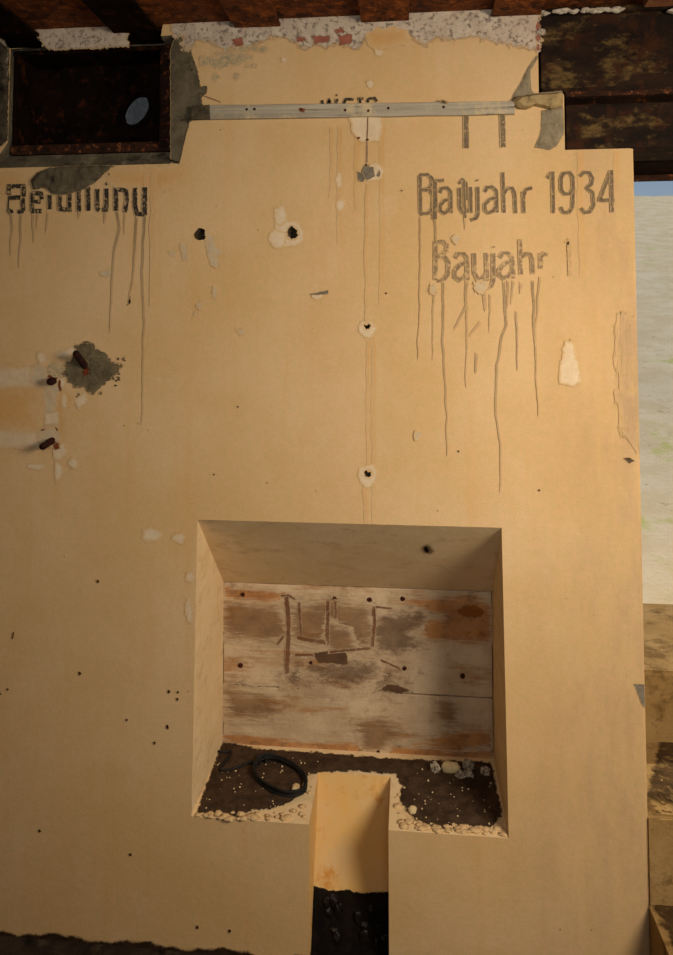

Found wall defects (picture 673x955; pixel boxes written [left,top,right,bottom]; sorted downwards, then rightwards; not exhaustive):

flaking render [169,9,544,54]
rust [0,170,25,196]
spalling [28,341,126,410]
leakage [104,211,147,425]
leakage [417,217,491,456]
leakage [495,277,541,492]
peeling [558,338,583,387]